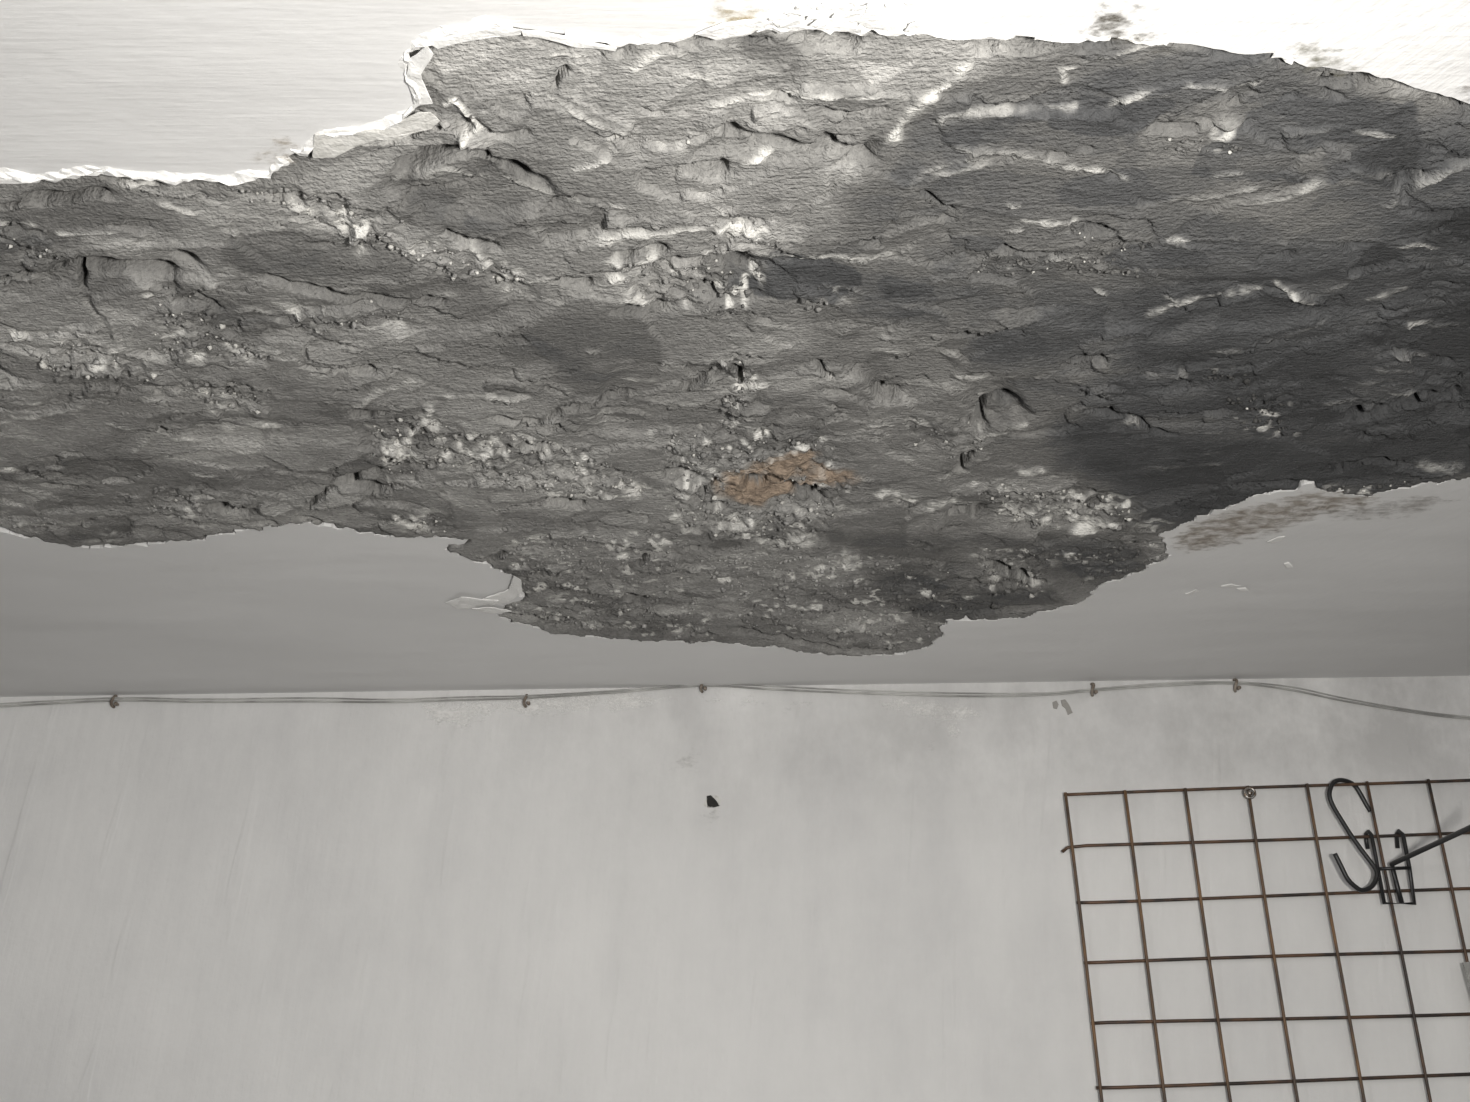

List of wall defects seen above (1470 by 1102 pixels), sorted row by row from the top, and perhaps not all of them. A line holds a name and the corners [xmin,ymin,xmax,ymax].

spalling [0,0,1470,656]